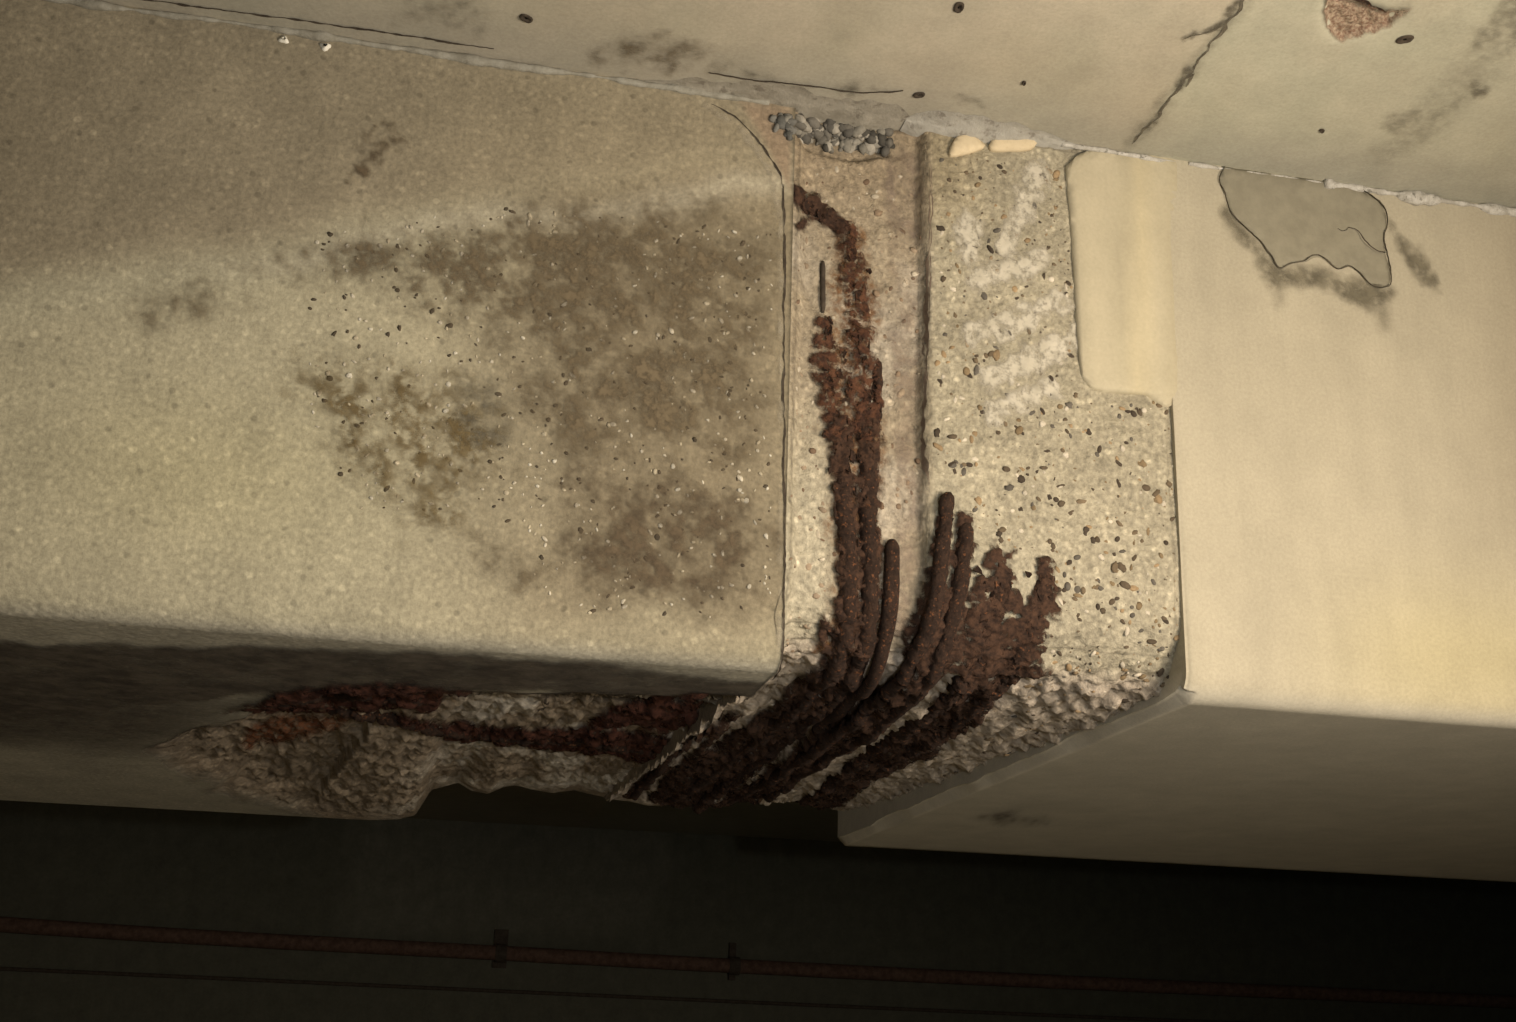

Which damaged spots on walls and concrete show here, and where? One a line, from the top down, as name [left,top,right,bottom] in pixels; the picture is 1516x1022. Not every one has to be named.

crack [1132,0,1244,144]
spalling [1324,0,1408,42]
damp [356,139,396,177]
damp [329,242,399,275]
damp [411,208,781,467]
damp [314,372,494,523]
corrosion [230,183,1062,814]
damp [563,483,749,600]
spalling [144,123,1179,820]